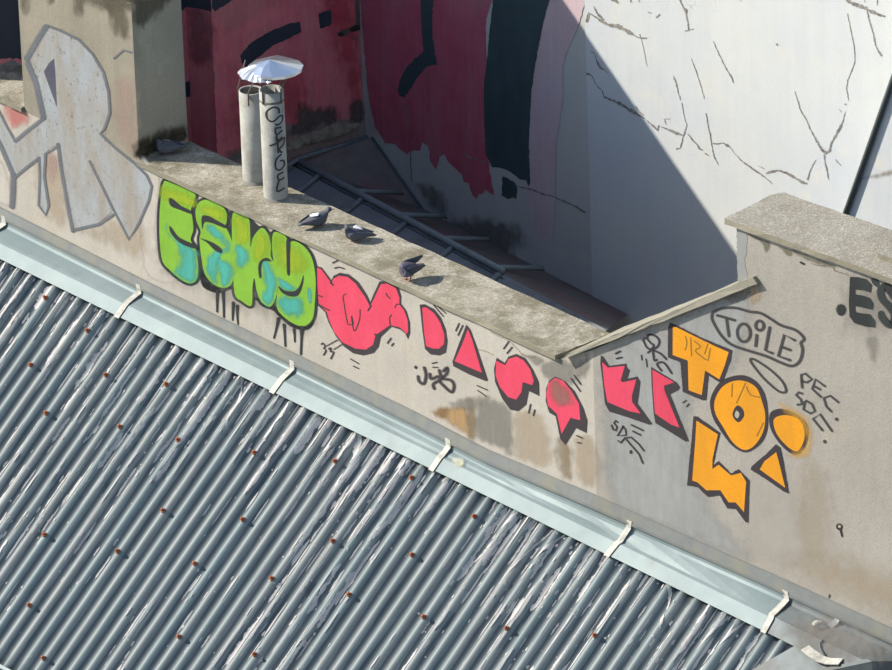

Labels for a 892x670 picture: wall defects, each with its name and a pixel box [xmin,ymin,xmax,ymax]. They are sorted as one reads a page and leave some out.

damp [76,0,169,37]
damp [133,127,186,157]
crack [586,0,885,184]
peeling [0,260,468,670]
peeling [393,501,767,670]